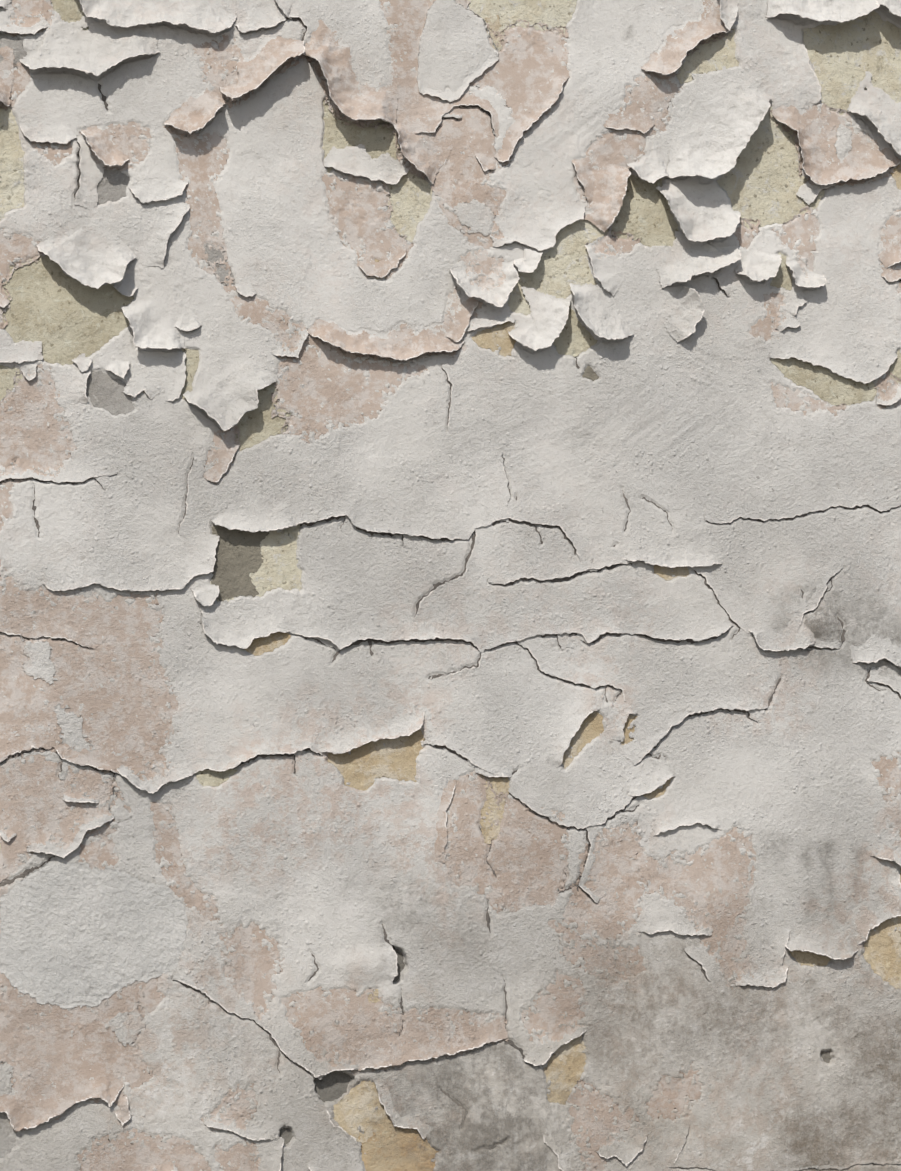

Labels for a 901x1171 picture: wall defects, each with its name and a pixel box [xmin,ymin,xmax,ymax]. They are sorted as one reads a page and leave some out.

peeling [0,0,901,531]
crack [0,458,118,537]
crack [705,479,901,524]
crack [0,616,99,649]
crack [199,450,841,903]
crack [0,713,337,798]
peeling [0,493,901,1171]
crack [172,961,327,1080]
crack [641,1123,901,1171]